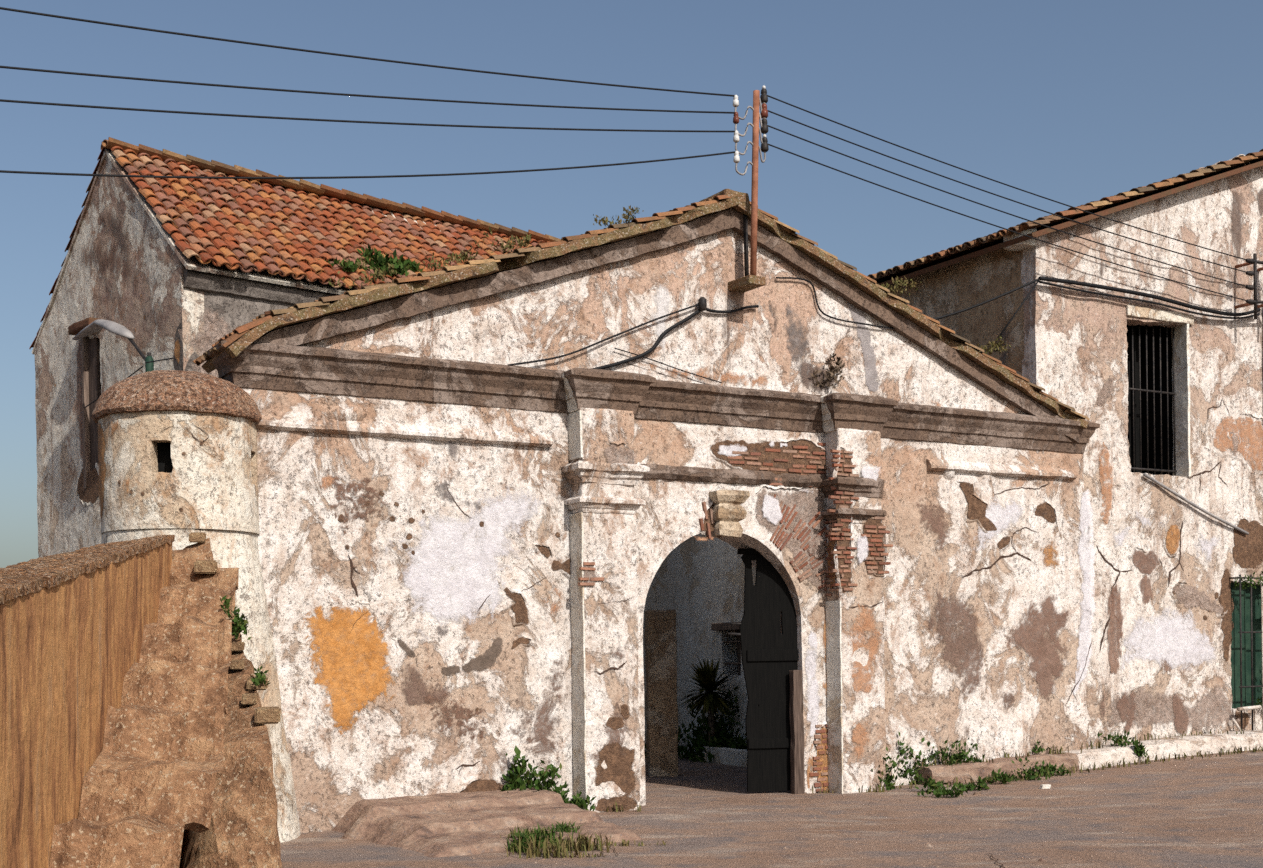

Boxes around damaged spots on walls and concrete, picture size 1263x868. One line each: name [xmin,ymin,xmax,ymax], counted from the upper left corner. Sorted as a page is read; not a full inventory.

peeling [299,601,400,747]
peeling [327,469,541,649]
spalling [532,532,604,586]
flaking render [710,437,893,597]
flaking render [805,632,829,792]
damp [928,591,986,695]
crack [962,527,1036,578]
spalling [957,479,1058,552]
damp [1007,596,1068,701]
crack [1065,546,1131,706]
peeling [1073,436,1263,695]